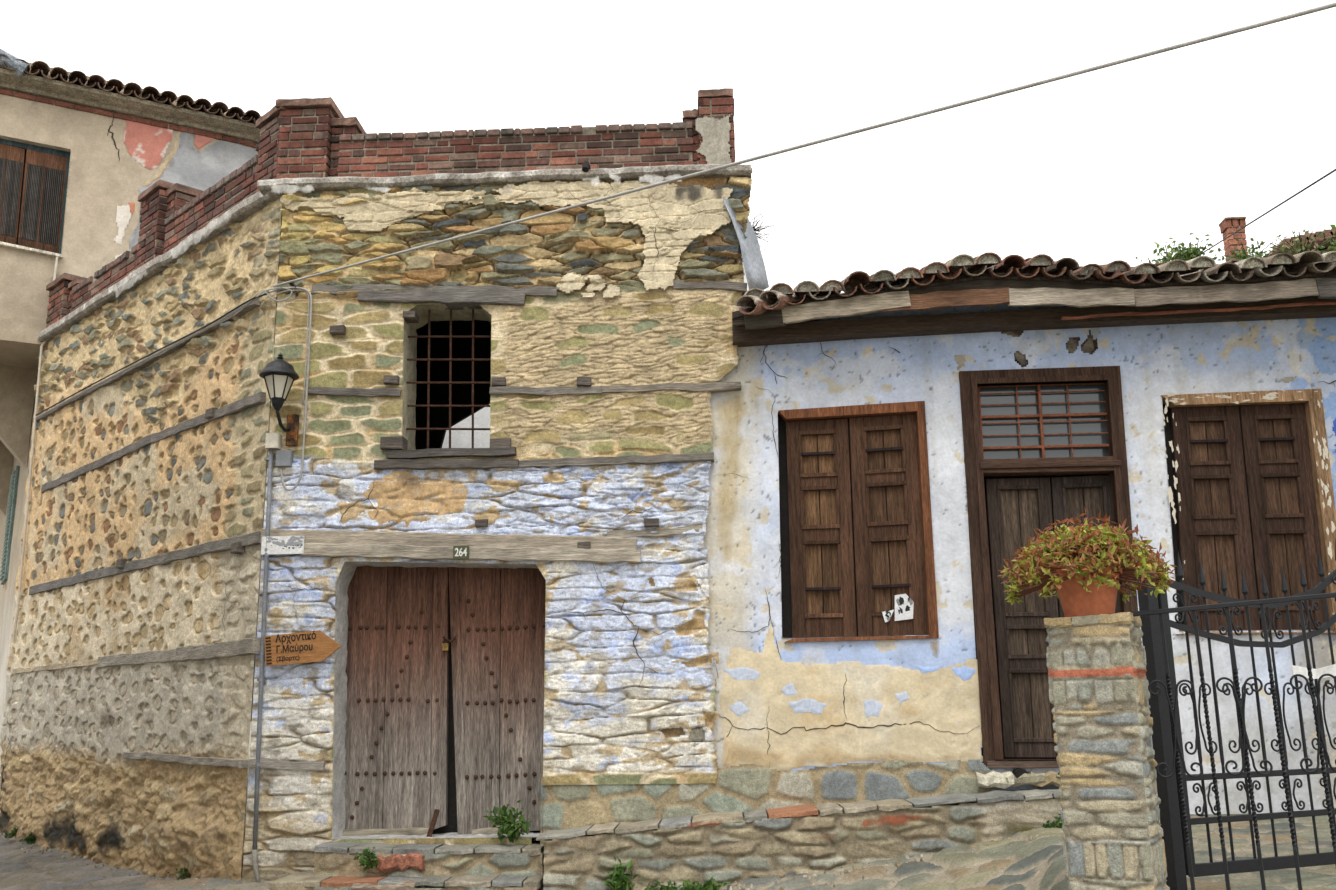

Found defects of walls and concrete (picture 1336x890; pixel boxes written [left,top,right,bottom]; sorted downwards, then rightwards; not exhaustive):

flaking render [124,115,173,170]
flaking render [194,129,220,150]
flaking render [113,202,135,261]
flaking render [280,180,733,291]
flaking render [557,272,620,298]
flaking render [337,470,527,529]
flaking render [542,472,565,483]
crack [732,541,781,657]
peeling [659,623,983,770]
crack [713,658,979,763]